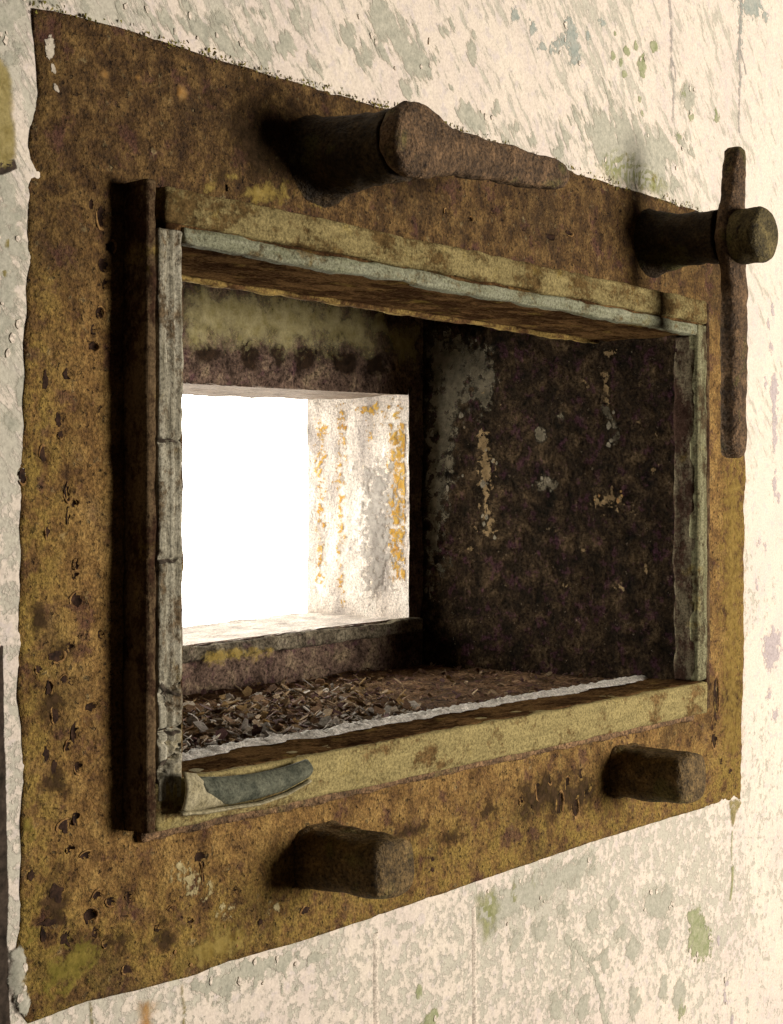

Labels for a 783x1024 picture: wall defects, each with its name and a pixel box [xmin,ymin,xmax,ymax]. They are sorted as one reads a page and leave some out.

rust [245,183,289,204]
water stain [184,286,421,376]
rust [313,396,405,604]
peeling [347,456,404,605]
peeling [421,322,501,633]
peeling [590,486,635,516]
rust [33,606,47,633]
rust [715,470,744,770]
rust [205,647,272,663]
rust [518,770,606,827]
rust [170,861,213,900]
rust [154,903,243,968]